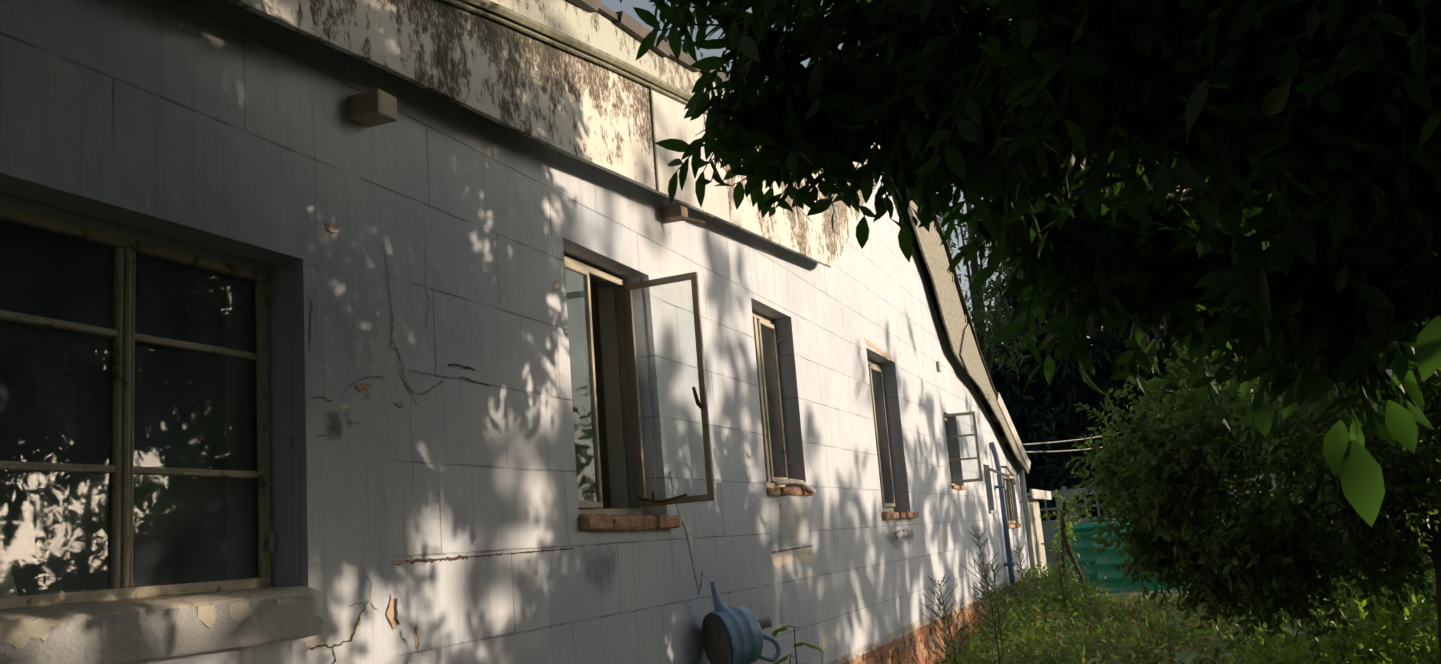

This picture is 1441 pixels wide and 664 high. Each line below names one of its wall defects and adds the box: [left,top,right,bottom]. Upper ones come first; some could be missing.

crack [383,242,489,482]
peeling [0,617,68,649]
peeling [197,602,250,628]
peeling [386,594,419,653]
crack [303,548,574,664]